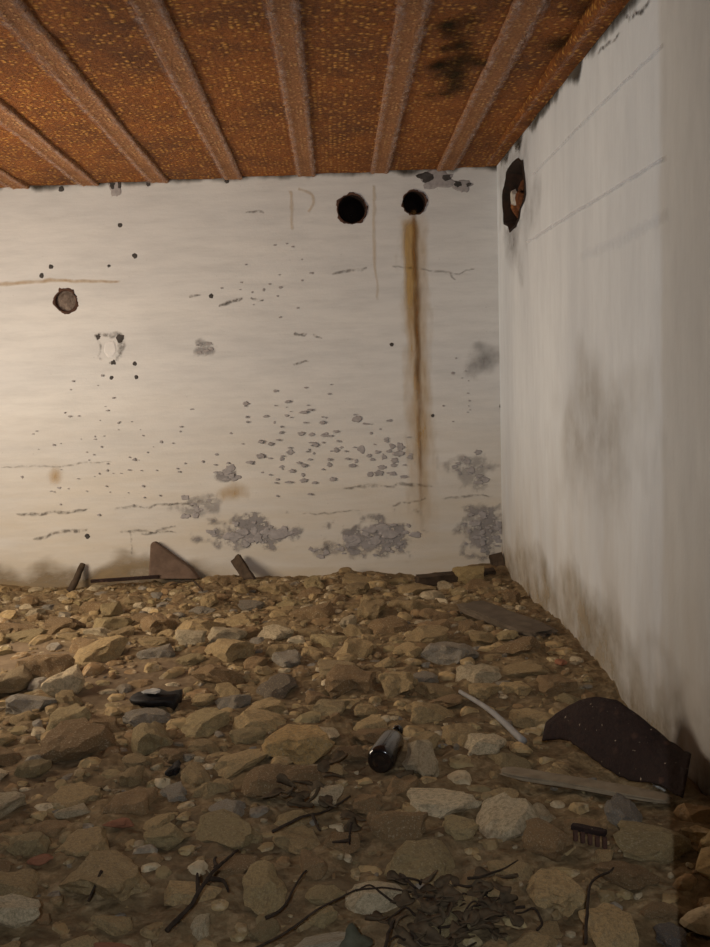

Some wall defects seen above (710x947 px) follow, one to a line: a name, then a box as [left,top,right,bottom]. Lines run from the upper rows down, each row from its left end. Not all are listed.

water stain [430,20,485,97]
corrosion [405,219,420,394]
peeling [193,512,302,550]
peeling [308,515,421,559]
peeling [459,506,502,560]